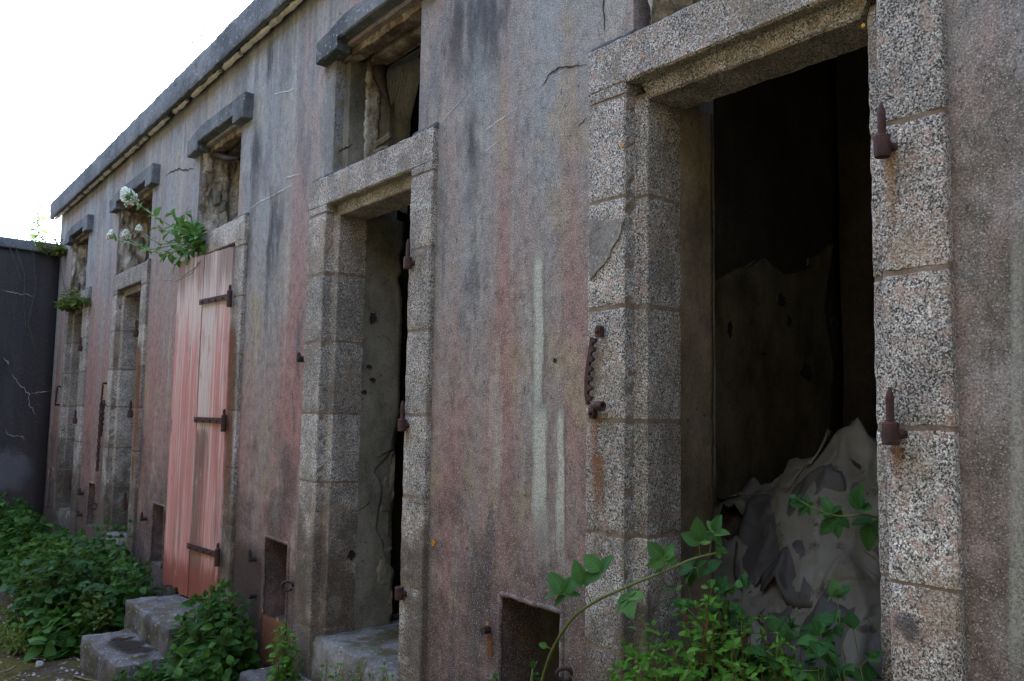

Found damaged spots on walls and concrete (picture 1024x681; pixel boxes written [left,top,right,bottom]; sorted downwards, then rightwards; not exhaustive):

damp [449,0,507,57]
crack [540,64,587,88]
crack [4,358,47,439]